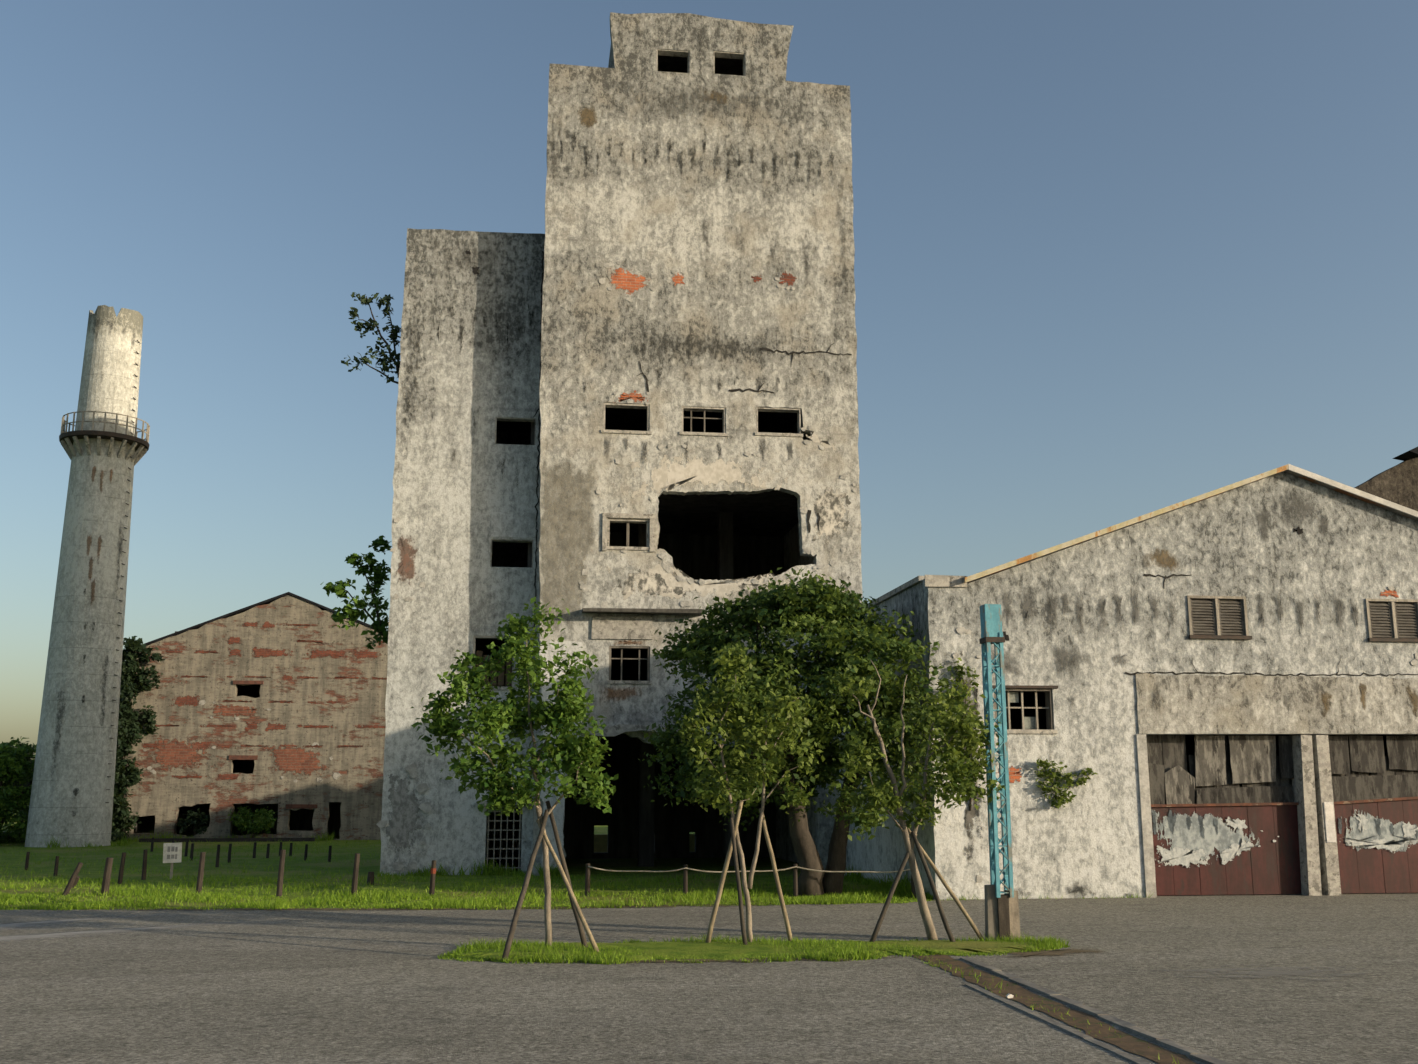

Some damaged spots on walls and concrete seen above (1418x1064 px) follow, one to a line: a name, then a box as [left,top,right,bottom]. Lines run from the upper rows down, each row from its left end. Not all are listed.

damp [552,108,834,182]
crack [729,343,852,393]
corrosion [91,466,113,491]
corrosion [87,536,102,603]
flaking render [390,517,425,602]
damp [540,464,594,625]
flaking render [600,474,857,608]
damp [1003,595,1175,630]
damp [1258,597,1358,627]
flaking render [142,695,386,783]
peeling [1151,810,1279,868]
peeling [1338,810,1418,853]